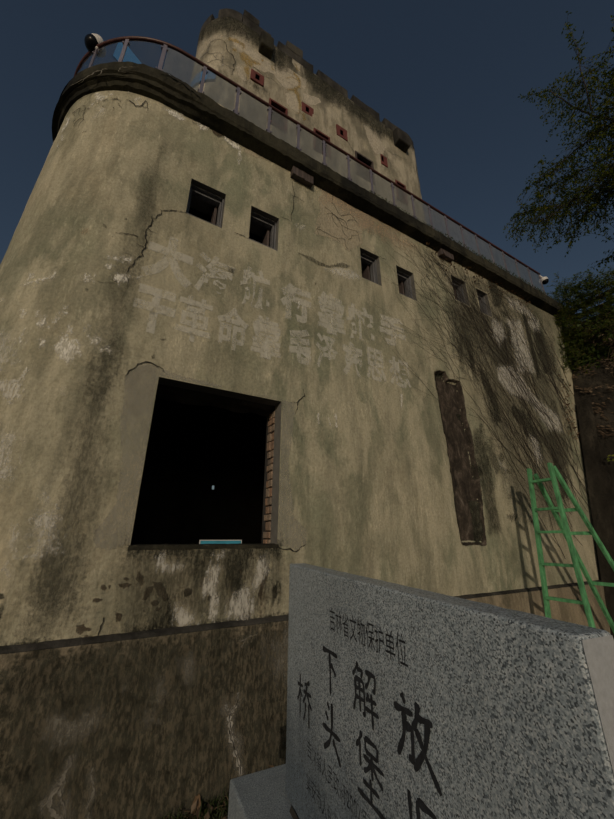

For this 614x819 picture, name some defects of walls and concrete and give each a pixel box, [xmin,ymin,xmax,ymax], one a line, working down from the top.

crack [98,210,186,285]
flaking render [93,572,169,611]
damp [0,377,289,819]